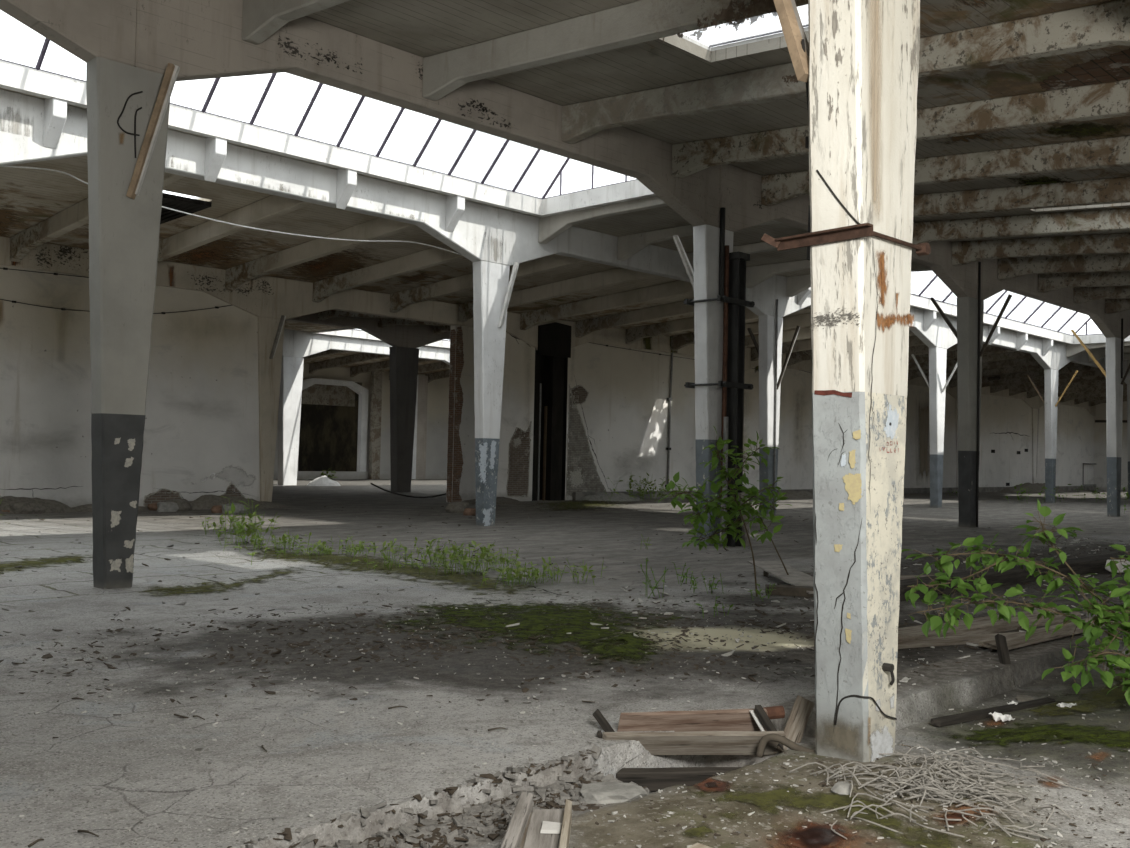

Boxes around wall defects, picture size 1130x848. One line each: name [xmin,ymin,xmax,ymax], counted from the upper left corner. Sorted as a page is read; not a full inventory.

corrosion [877,252,914,332]
peeling [114,437,135,468]
flaking render [220,482,245,498]
flaking render [446,326,464,502]
peeling [482,508,492,526]
flaking render [478,421,532,497]
flaking render [566,384,606,497]
crack [814,248,883,743]
peeling [109,539,135,573]